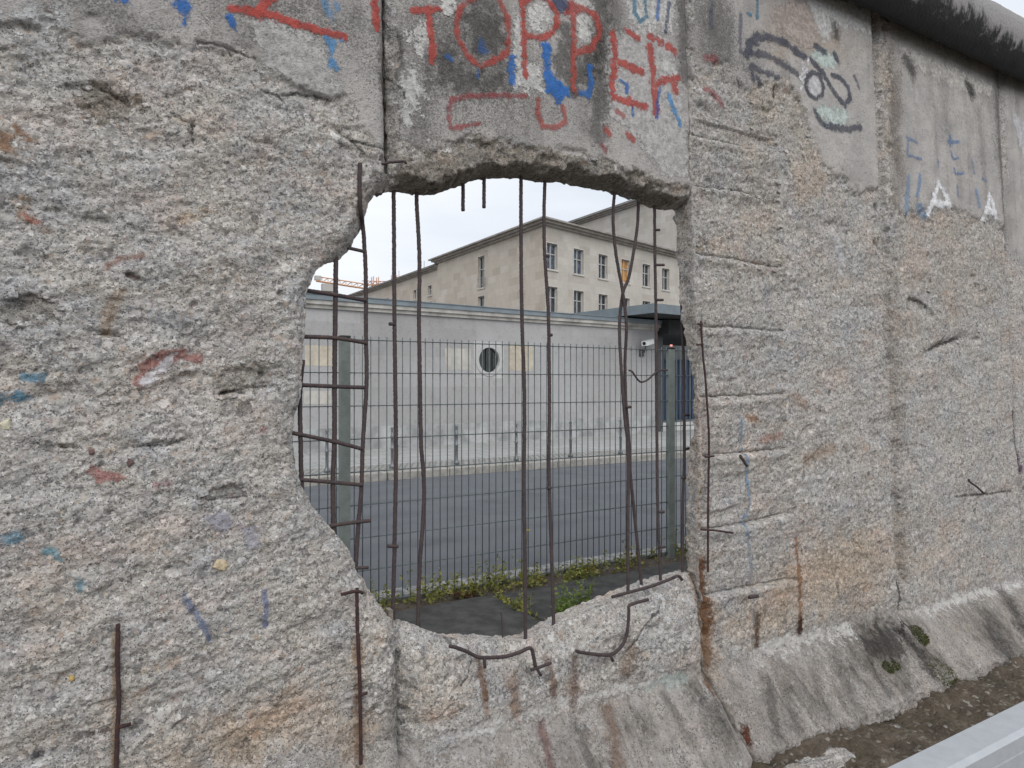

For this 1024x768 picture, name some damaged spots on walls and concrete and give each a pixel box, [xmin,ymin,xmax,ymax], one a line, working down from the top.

spalling [386,0,872,701]
corrosion [692,556,715,696]
corrosion [795,537,803,634]